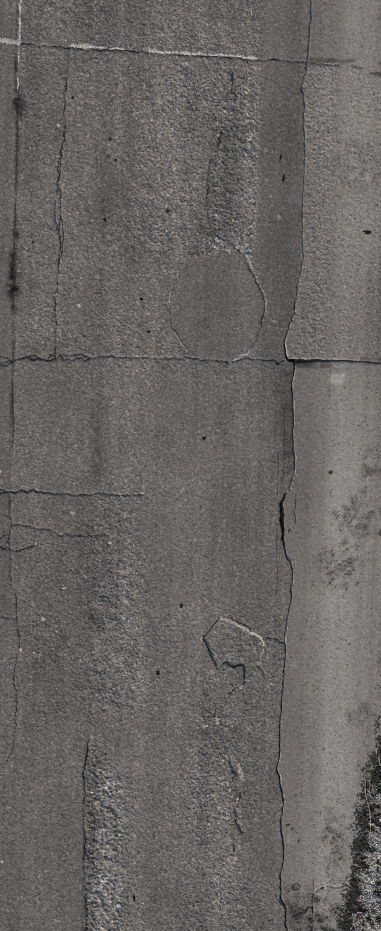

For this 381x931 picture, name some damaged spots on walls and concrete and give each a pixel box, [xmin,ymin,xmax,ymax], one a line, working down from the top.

crack [167,53,338,65]
crack [0,43,151,446]
crack [0,489,141,764]
crack [161,246,324,931]
crack [82,740,90,862]
water stain [286,885,338,931]